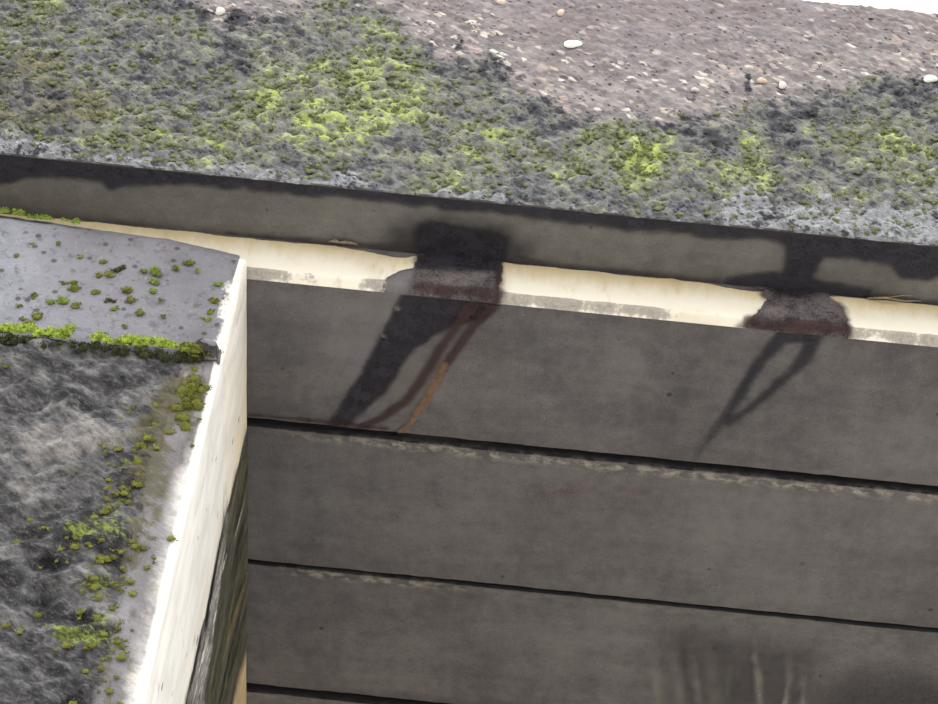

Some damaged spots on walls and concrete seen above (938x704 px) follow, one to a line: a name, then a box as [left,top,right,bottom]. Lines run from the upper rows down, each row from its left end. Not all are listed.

rust [299,221,527,433]
water stain [0,155,938,431]